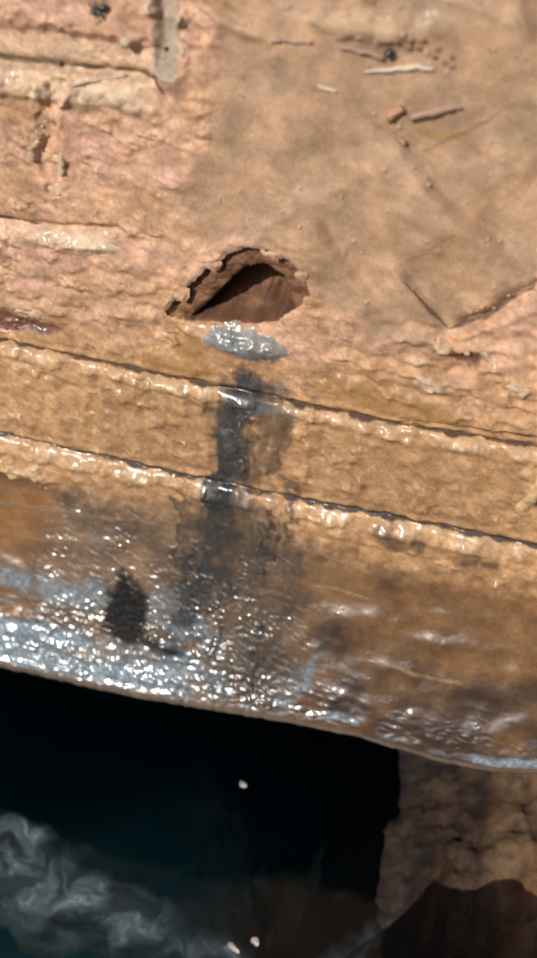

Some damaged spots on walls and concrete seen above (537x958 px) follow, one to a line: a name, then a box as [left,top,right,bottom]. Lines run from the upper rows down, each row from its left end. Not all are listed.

spalling [165,247,313,324]
damp [178,366,369,666]
damp [0,568,182,692]
damp [476,759,537,767]